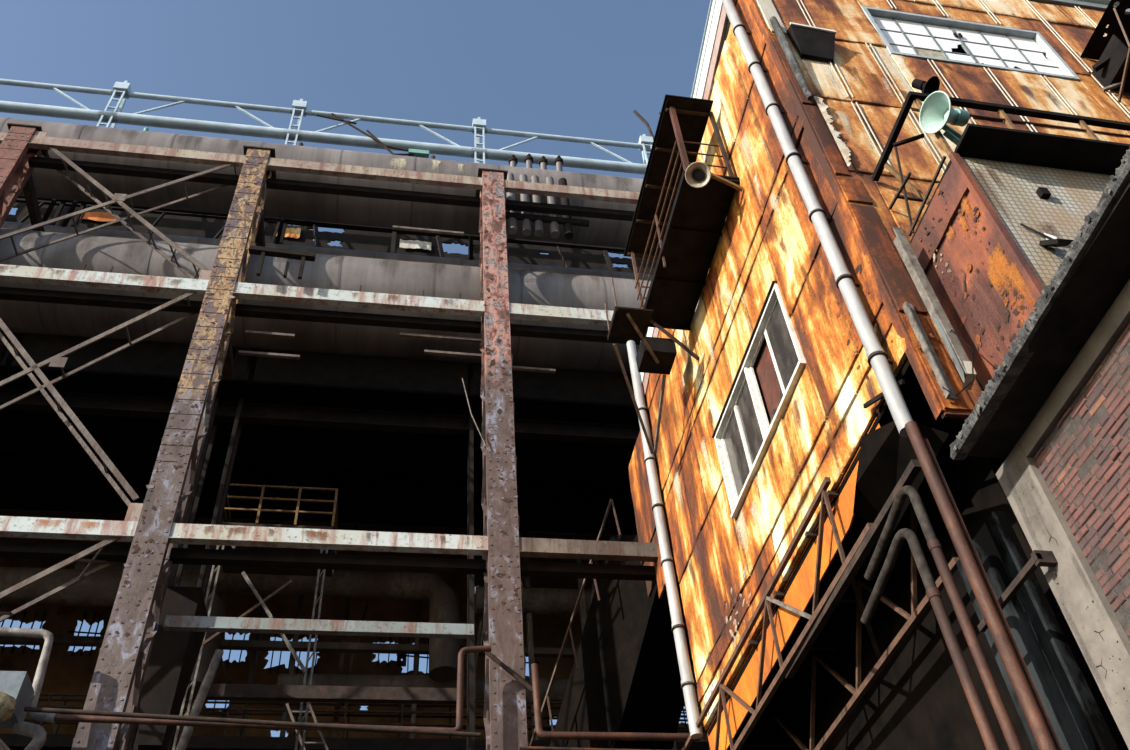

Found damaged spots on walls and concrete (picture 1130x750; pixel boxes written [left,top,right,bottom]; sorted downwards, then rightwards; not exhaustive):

rust [779,164,799,204]
rust [764,219,785,250]
rust [801,263,874,399]
rust [652,387,679,456]
rust [827,408,847,444]
rust [689,532,707,581]
rust [687,605,712,667]